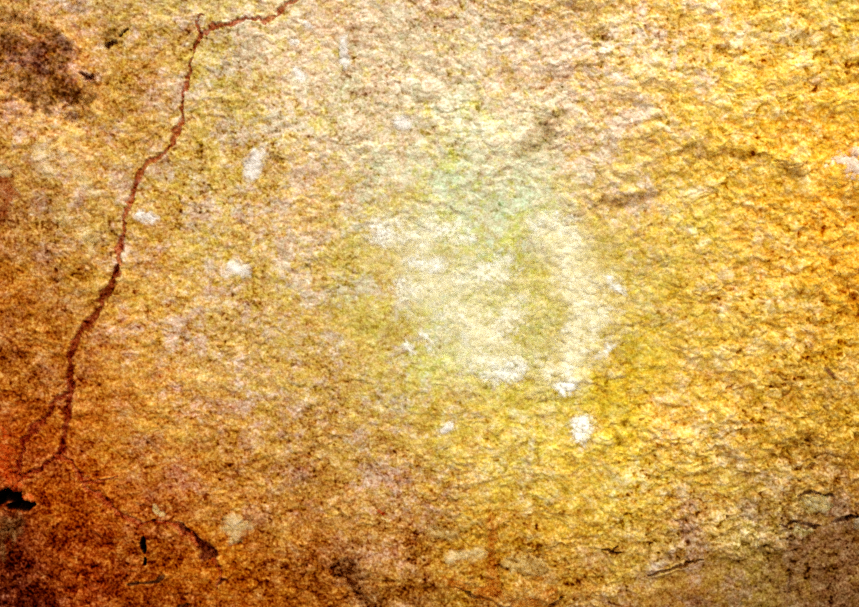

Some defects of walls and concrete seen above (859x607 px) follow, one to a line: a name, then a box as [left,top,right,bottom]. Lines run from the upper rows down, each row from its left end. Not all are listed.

crack [10,0,297,588]
crack [459,588,502,607]